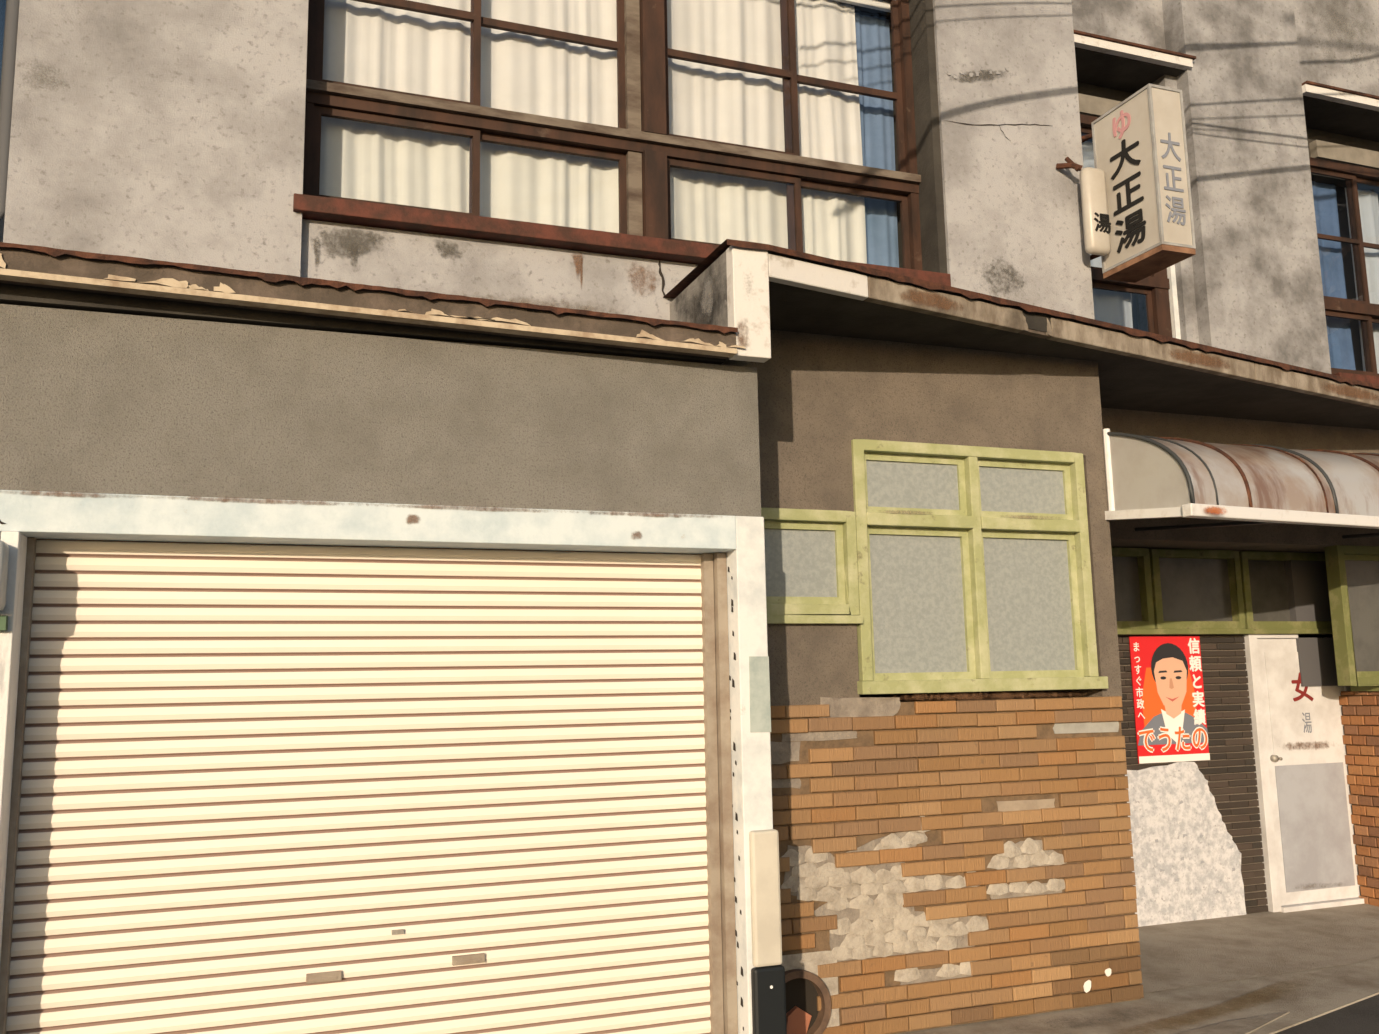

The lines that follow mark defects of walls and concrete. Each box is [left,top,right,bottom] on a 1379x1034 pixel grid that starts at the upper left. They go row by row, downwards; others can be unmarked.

damp [436,243,458,257]
peeling [104,274,236,293]
peeling [388,309,531,326]
rust [1205,506,1226,514]
spalling [781,816,1065,985]